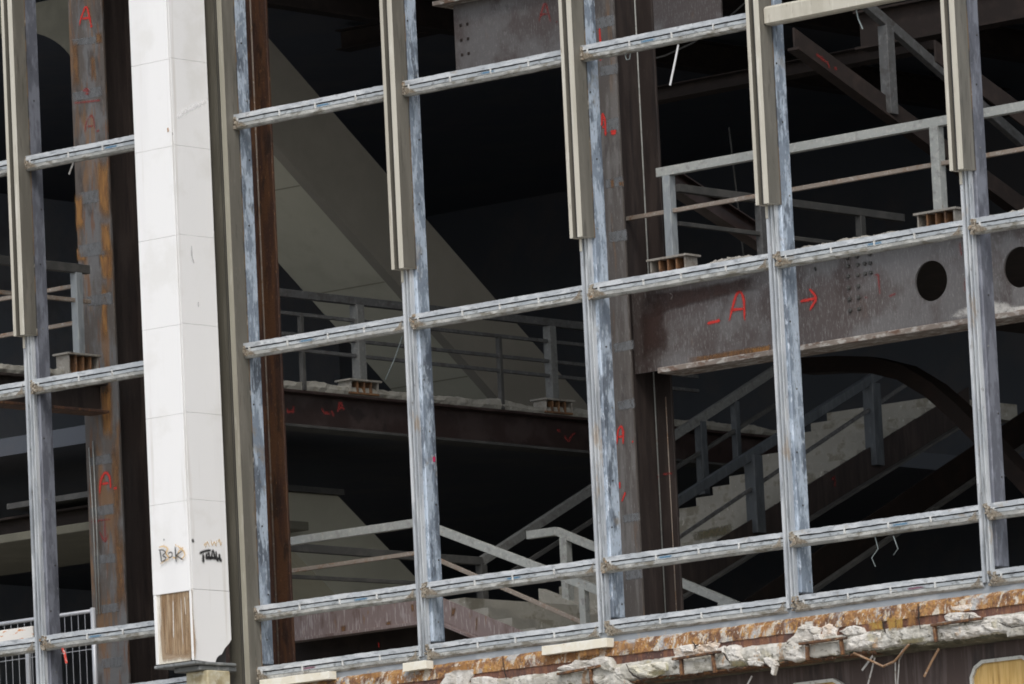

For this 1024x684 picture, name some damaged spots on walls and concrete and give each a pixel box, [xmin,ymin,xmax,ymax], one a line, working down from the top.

corrosion [75,198,83,227]
corrosion [98,166,112,277]
spalling [440,669,498,684]
corrosion [303,589,1024,684]
spalling [533,604,1024,684]